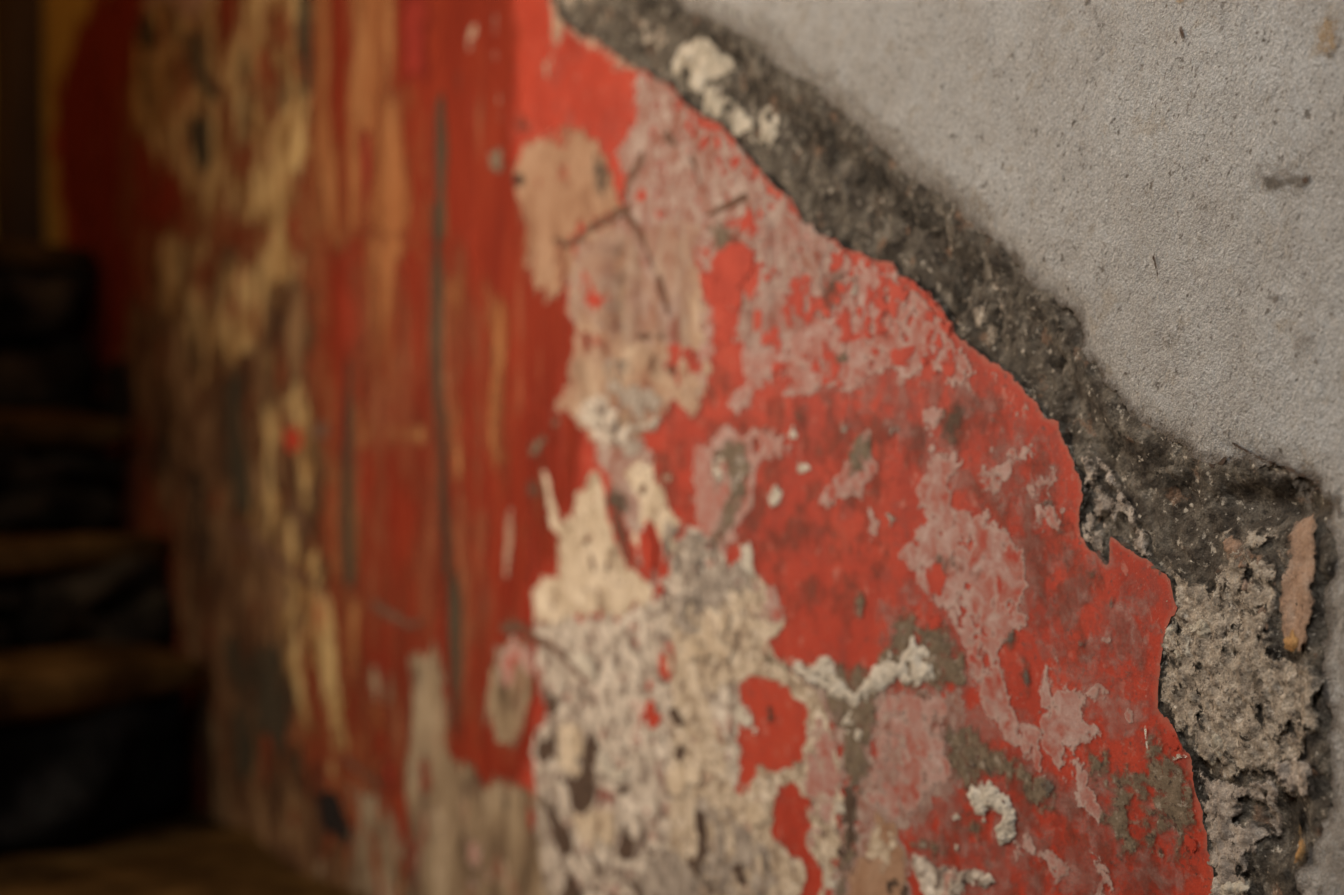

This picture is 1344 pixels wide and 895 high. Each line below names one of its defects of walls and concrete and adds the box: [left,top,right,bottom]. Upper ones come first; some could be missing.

spalling [404,0,1341,895]
leakage [952,780,1016,845]
leakage [910,838,995,895]